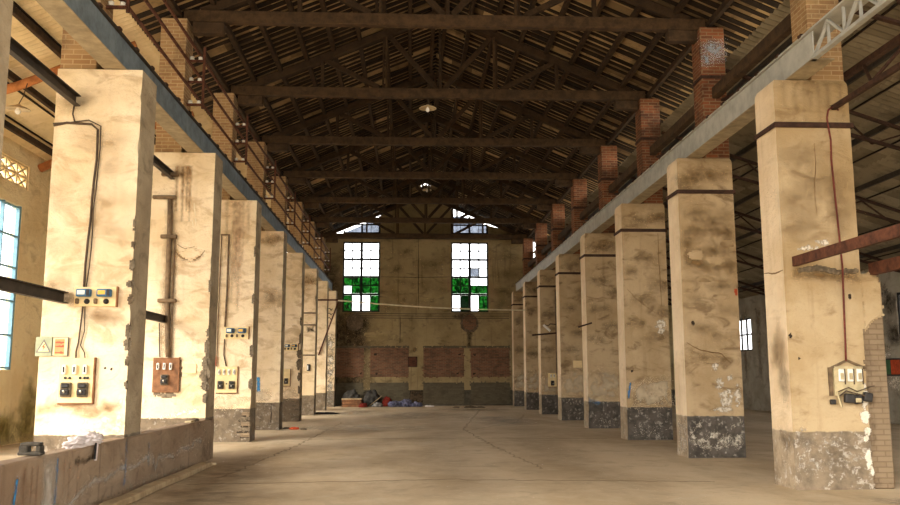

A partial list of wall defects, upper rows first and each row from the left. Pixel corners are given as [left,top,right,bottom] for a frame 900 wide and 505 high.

flaking render [126,216,136,306]
flaking render [123,322,132,366]
flaking render [149,326,251,438]
peeling [712,363,741,412]
flaking render [794,264,895,488]
efflorescence [679,419,741,449]